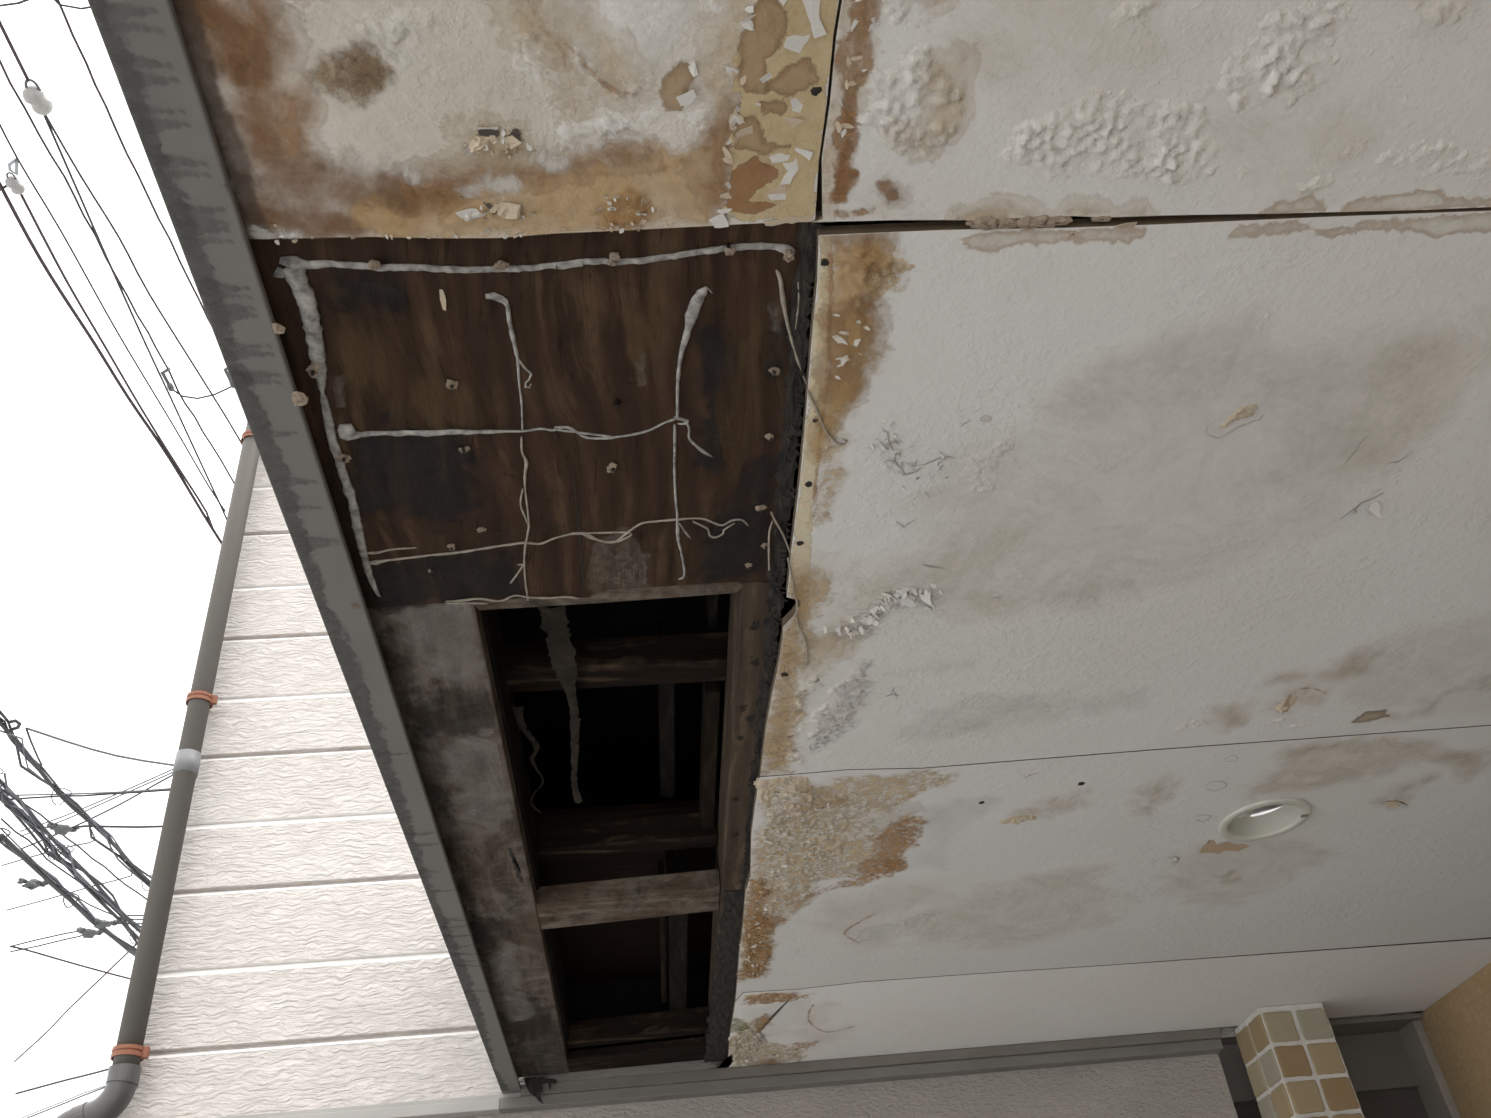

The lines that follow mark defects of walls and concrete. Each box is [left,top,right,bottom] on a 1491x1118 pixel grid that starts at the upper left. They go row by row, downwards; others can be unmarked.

damp [172,0,735,239]
peeling [658,61,698,111]
damp [694,320,788,474]
peeling [709,0,870,594]
damp [811,239,905,516]
damp [739,575,948,978]
peeling [1200,840,1248,854]
damp [729,993,834,1066]